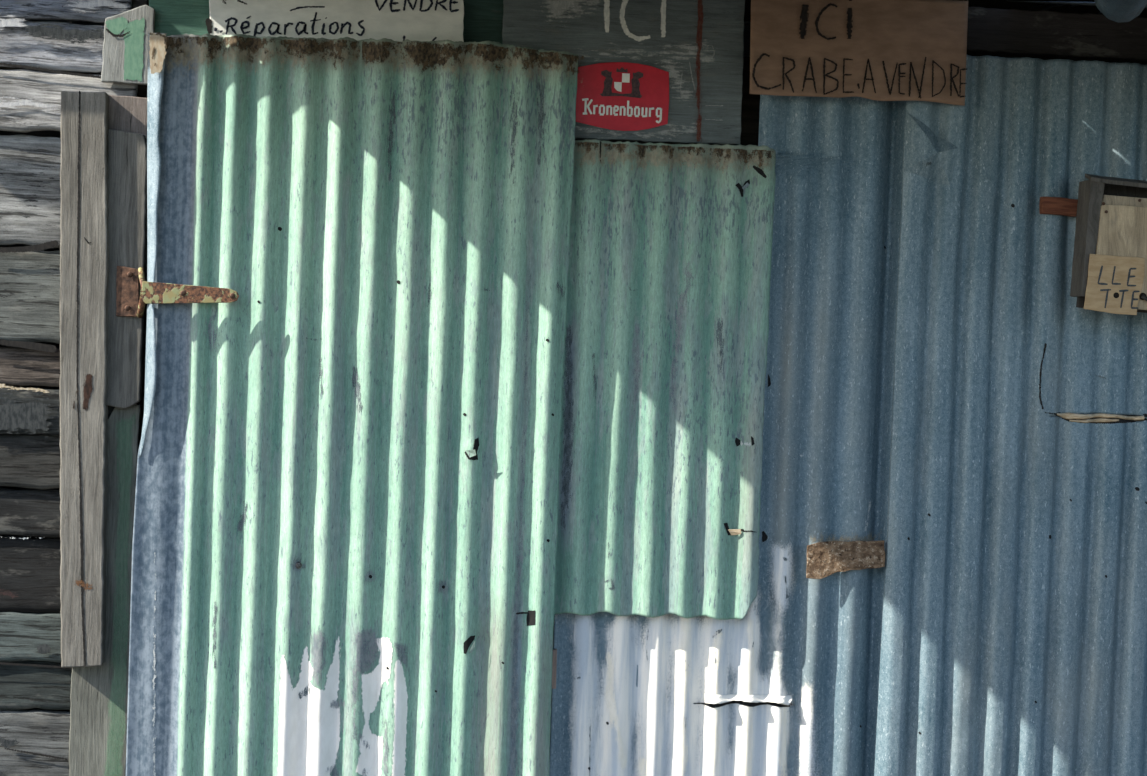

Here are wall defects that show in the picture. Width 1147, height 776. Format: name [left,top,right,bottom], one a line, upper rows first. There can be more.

corrosion [165,36,585,84]
crack [1039,343,1047,409]
peeling [278,625,410,776]